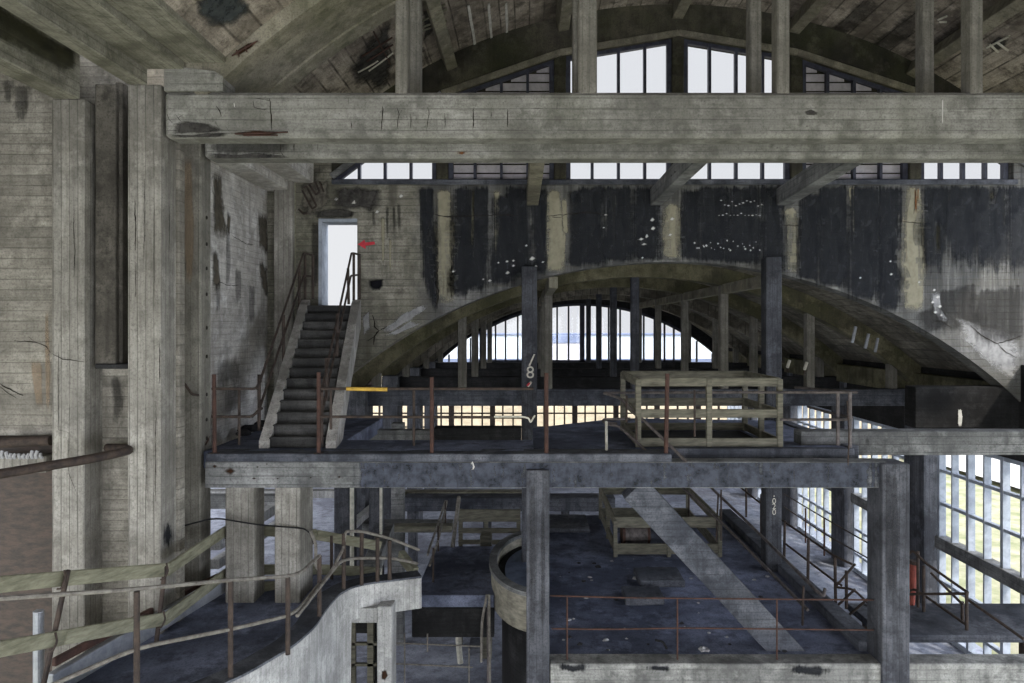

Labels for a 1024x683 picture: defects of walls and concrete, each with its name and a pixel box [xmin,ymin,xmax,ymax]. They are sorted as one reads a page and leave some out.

damp [200,0,246,23]
spalling [350,24,394,89]
damp [419,185,1024,312]
peeling [386,307,425,334]
peeling [931,289,946,318]
crack [942,321,1024,358]
peeling [963,325,1018,376]
crack [19,336,83,493]